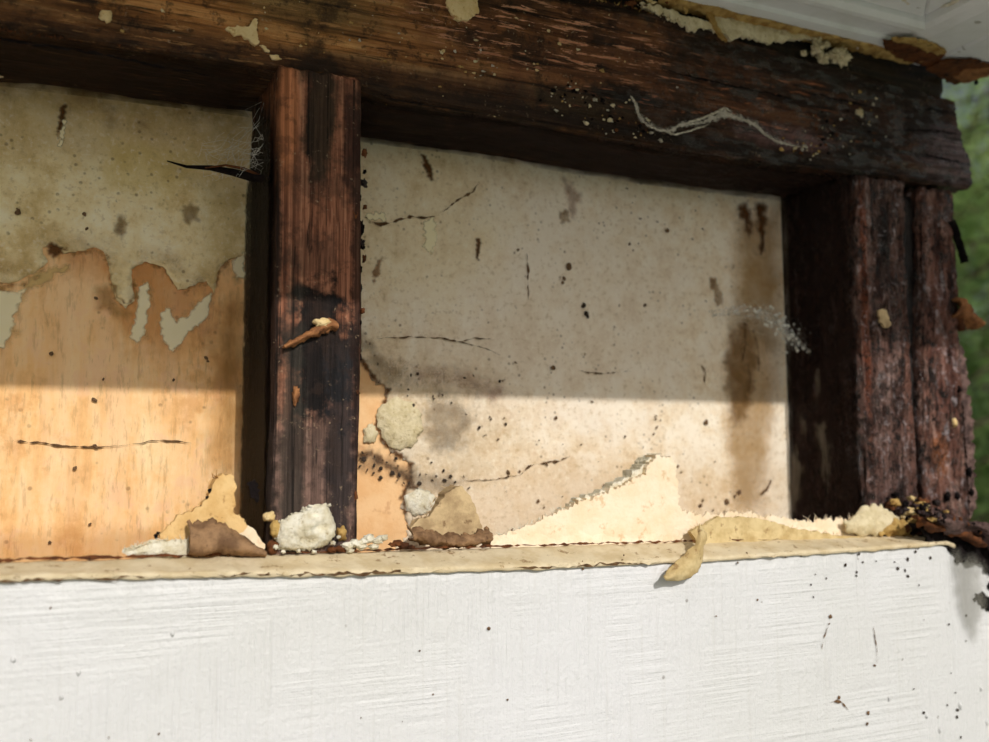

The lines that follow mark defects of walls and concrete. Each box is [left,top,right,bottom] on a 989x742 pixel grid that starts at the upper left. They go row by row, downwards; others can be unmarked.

crack [365,184,478,253]
crack [7,440,188,448]
peeling [0,245,245,562]
crack [378,336,495,353]
leakage [699,203,773,512]
peeling [911,467,989,611]